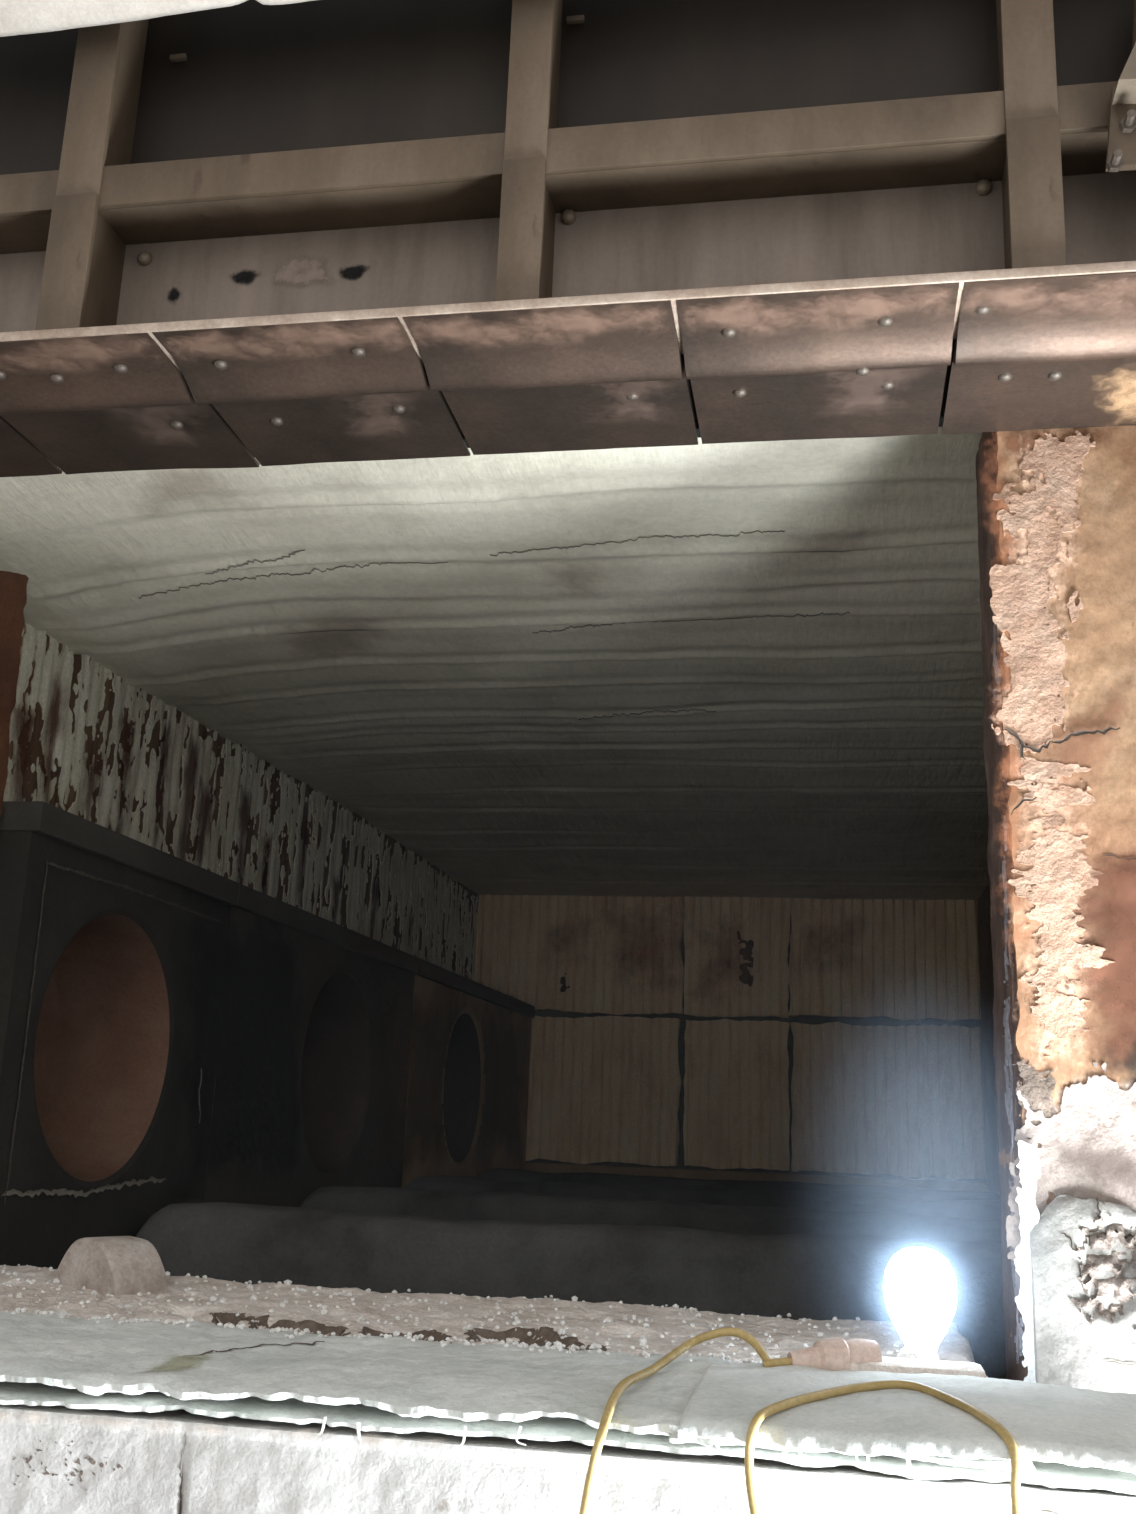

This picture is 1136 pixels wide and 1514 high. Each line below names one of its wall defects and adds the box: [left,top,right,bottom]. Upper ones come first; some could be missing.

crack [139,550,448,599]
crack [490,530,785,557]
corrosion [16,682,61,802]
corrosion [116,716,134,833]
corrosion [155,725,170,841]
corrosion [180,742,213,862]
peeling [3,623,478,981]
corrosion [238,793,251,884]
crack [1011,797,1036,815]
crack [1004,726,1120,760]
peeling [989,431,1136,1331]
crack [178,1441,186,1514]